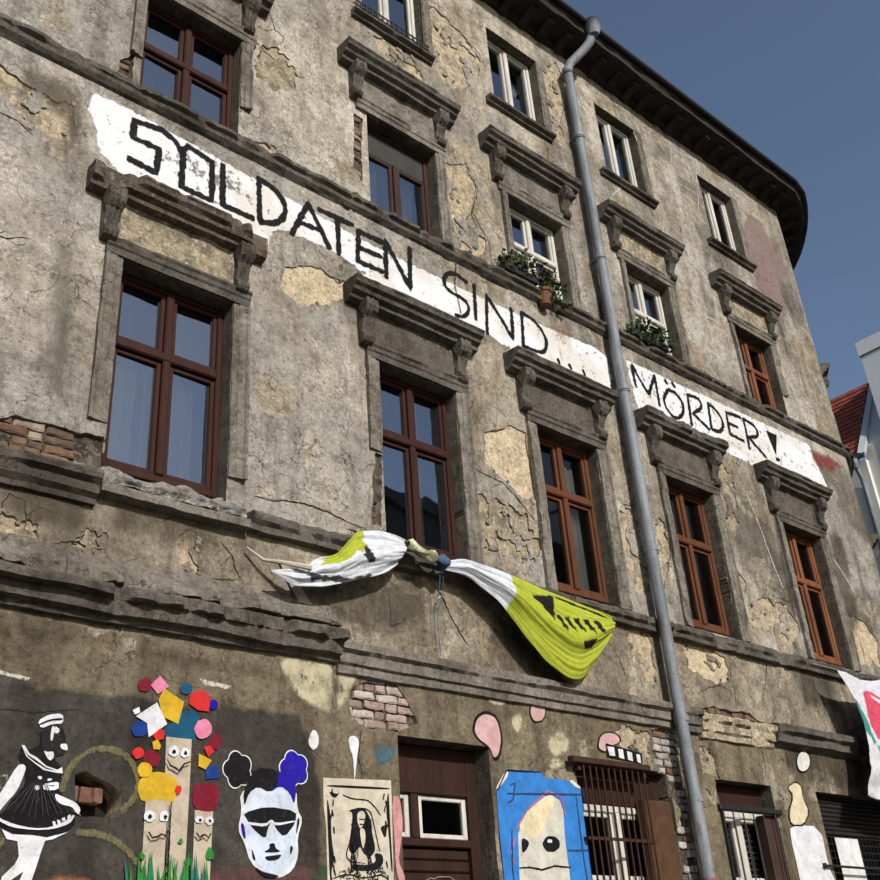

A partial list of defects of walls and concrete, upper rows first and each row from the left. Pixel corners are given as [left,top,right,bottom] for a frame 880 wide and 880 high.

spalling [253,41,302,92]
spalling [419,5,480,91]
spalling [445,163,486,259]
spalling [280,266,344,306]
flaking render [0,416,102,469]
spalling [484,425,536,505]
crack [1,493,58,534]
crack [254,495,367,532]
crack [56,529,102,550]
spalling [748,597,799,648]
peeling [683,644,734,688]
flaking render [349,679,415,732]